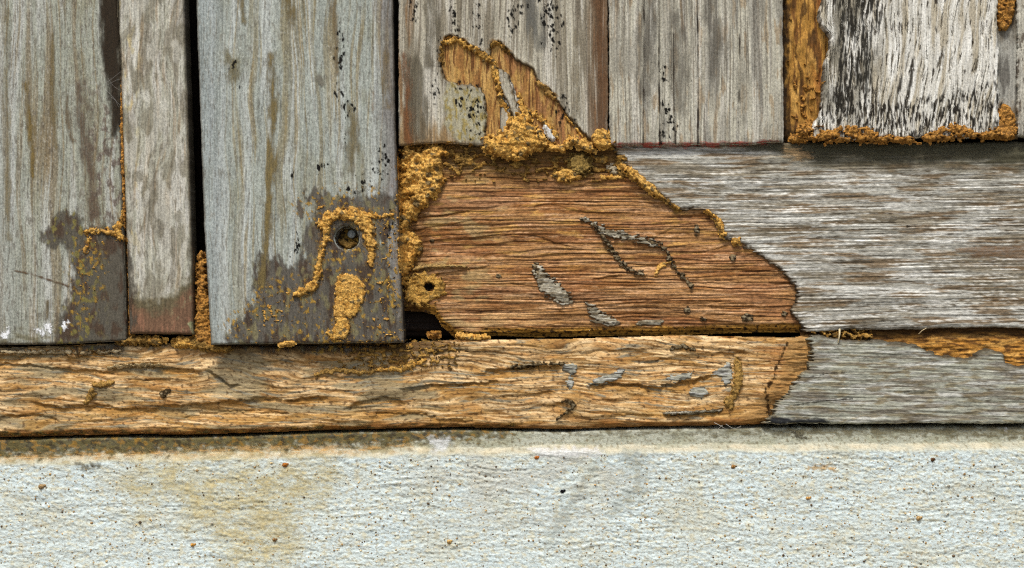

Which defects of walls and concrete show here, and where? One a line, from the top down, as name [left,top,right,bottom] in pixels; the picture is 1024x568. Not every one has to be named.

water stain [316,5,359,163]
water stain [41,41,137,353]
water stain [225,53,403,355]
peeling [567,152,618,175]
peeling [579,216,694,289]
peeling [531,262,620,328]
efflorescence [529,447,602,457]
water stain [606,426,857,437]
water stain [871,423,1024,439]
water stain [0,424,528,557]